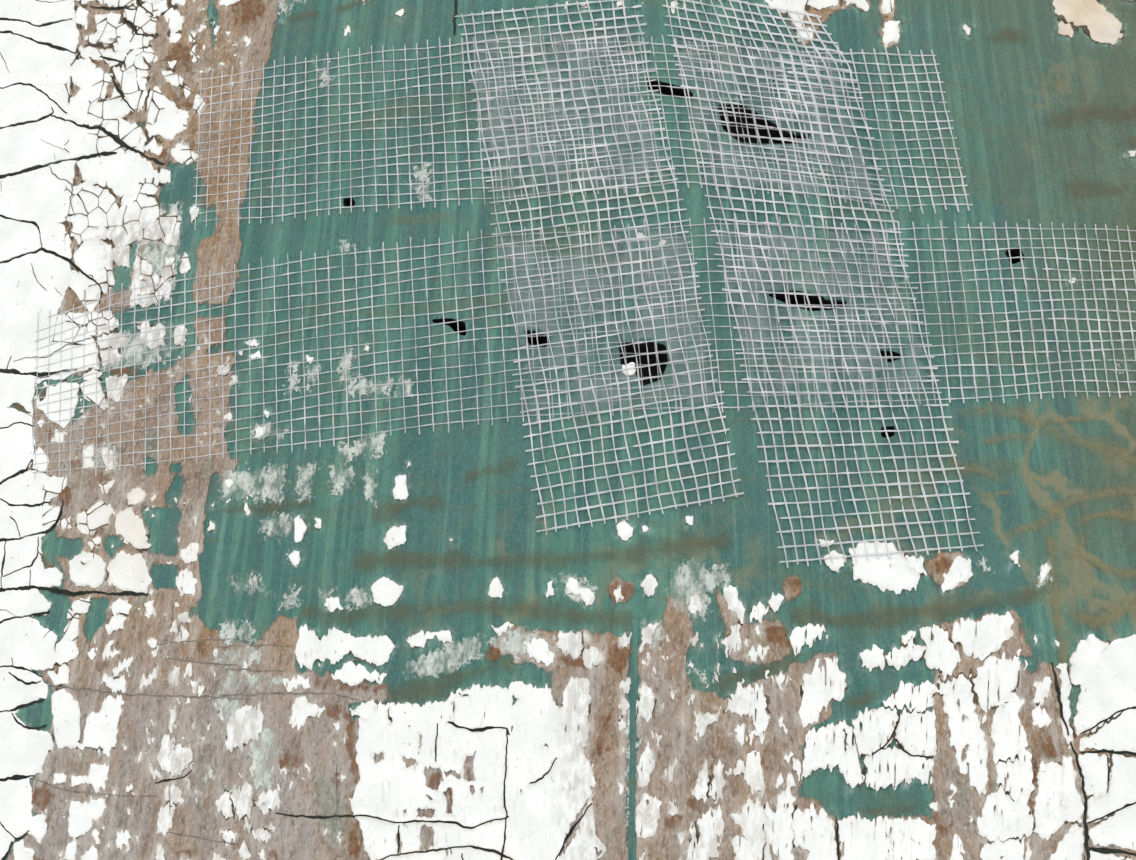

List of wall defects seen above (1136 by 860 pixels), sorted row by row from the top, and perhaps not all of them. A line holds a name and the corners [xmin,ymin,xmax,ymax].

crack [781,0,846,32]
peeling [764,0,900,49]
peeling [1052,0,1124,45]
peeling [0,0,632,860]
peeling [616,520,648,541]
peeling [818,539,973,595]
peeling [635,575,1136,860]
crack [851,626,1136,860]
crack [555,803,592,860]
crack [689,766,714,845]
crack [762,803,797,860]
crack [833,816,841,860]